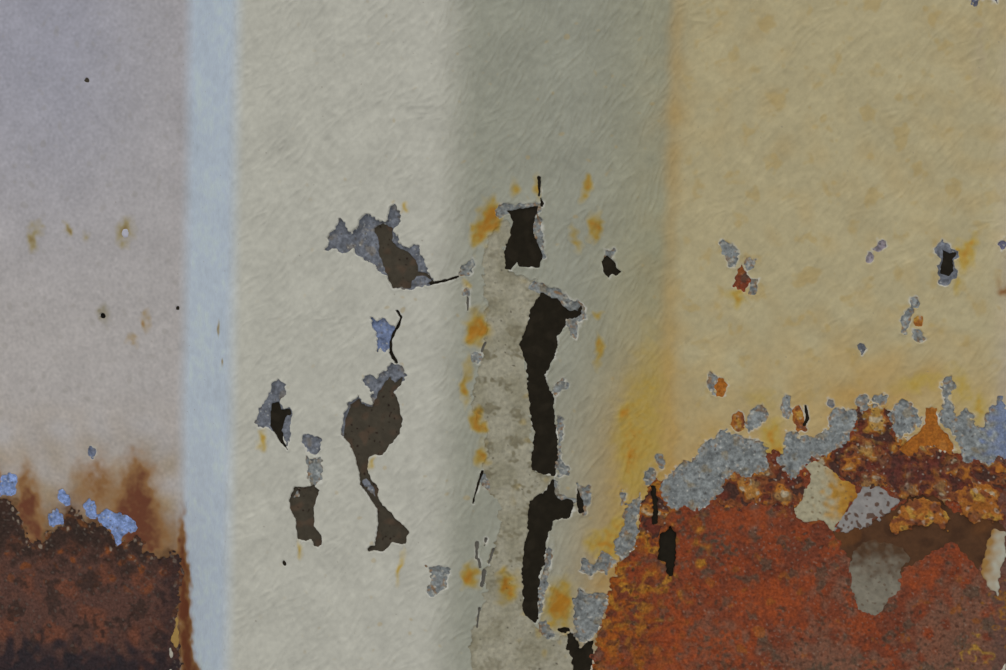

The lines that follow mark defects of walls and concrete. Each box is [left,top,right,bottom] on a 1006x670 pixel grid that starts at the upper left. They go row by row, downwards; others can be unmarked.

corrosion [467,171,542,258]
corrosion [566,172,607,257]
peeling [602,248,621,277]
peeling [719,240,758,295]
peeling [934,240,959,286]
peeling [254,379,323,547]
peeling [325,204,591,670]
corrosion [457,297,496,472]
corrosion [538,310,1006,670]
peeling [780,395,809,432]
corrosion [0,438,203,670]
corrosion [458,557,524,609]